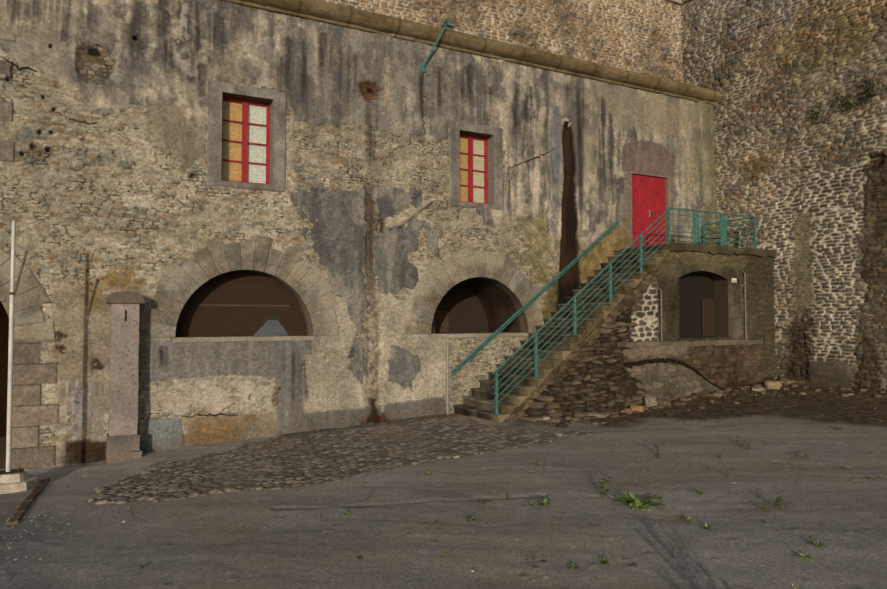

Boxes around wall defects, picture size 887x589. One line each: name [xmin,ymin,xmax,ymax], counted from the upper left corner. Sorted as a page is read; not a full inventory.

damp [122,2,147,53]
crack [1,56,37,80]
spalling [74,42,115,83]
corrosion [357,77,384,103]
flaking render [0,53,206,242]
crack [505,148,555,204]
damp [554,88,582,311]
crack [181,407,238,417]
corrosion [361,398,387,425]